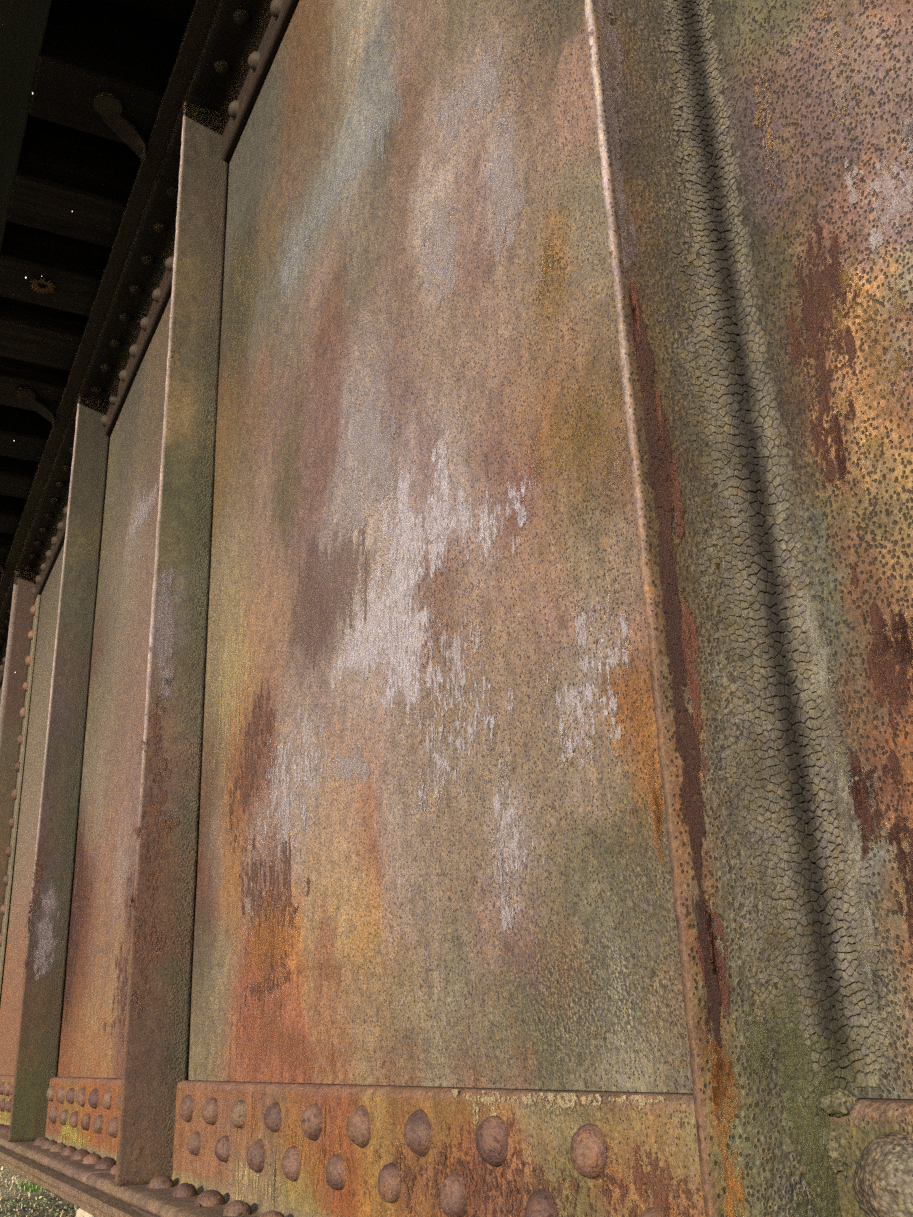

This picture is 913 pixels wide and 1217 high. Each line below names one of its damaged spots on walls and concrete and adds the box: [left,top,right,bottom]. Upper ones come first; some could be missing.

corrosion [786,207,861,486]
corrosion [595,0,743,1217]
crack [663,0,897,1152]
corrosion [863,601,913,724]
corrosion [64,817,92,1023]
corrosion [103,696,179,1048]
corrosion [229,683,341,1004]
corrosion [837,746,913,962]
corrosion [373,1134,586,1217]